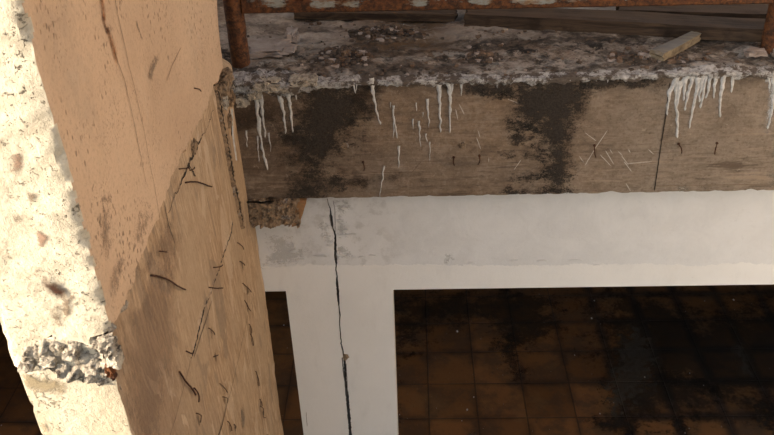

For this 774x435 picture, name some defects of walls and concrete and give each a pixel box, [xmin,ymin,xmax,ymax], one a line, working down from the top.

spalling [216,67,236,128]
leakage [231,64,774,198]
crack [108,0,245,435]
spalling [247,197,307,229]
spalling [34,270,73,326]
crack [95,300,129,339]
crack [327,198,352,435]
spalling [17,333,125,394]